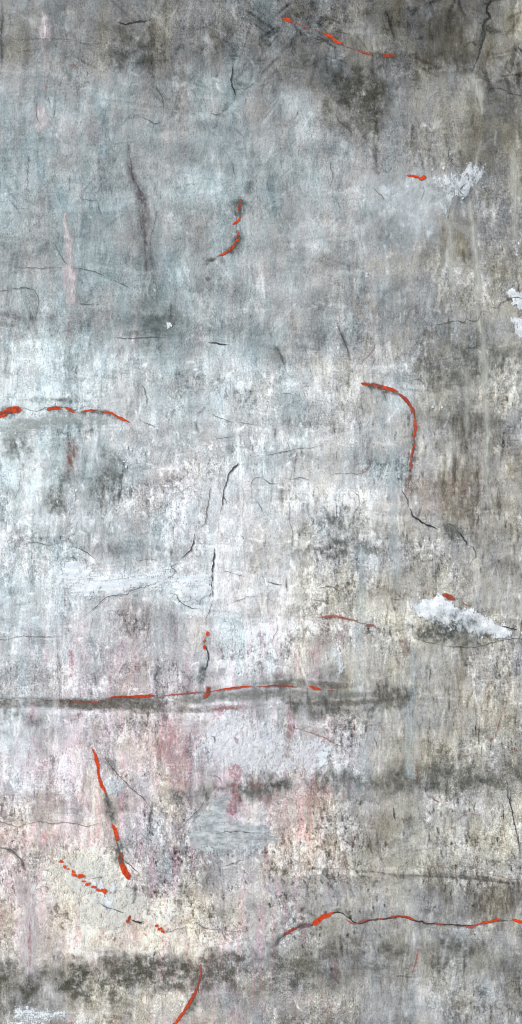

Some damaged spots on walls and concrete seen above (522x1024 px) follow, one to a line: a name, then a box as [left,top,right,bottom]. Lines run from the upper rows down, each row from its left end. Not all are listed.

crack [283,15,395,58]
crack [206,199,246,264]
crack [0,386,153,426]
crack [339,329,476,565]
crack [0,445,363,712]
flaking render [409,592,522,643]
crack [0,747,155,924]
crack [281,912,522,938]
crack [169,923,240,1024]